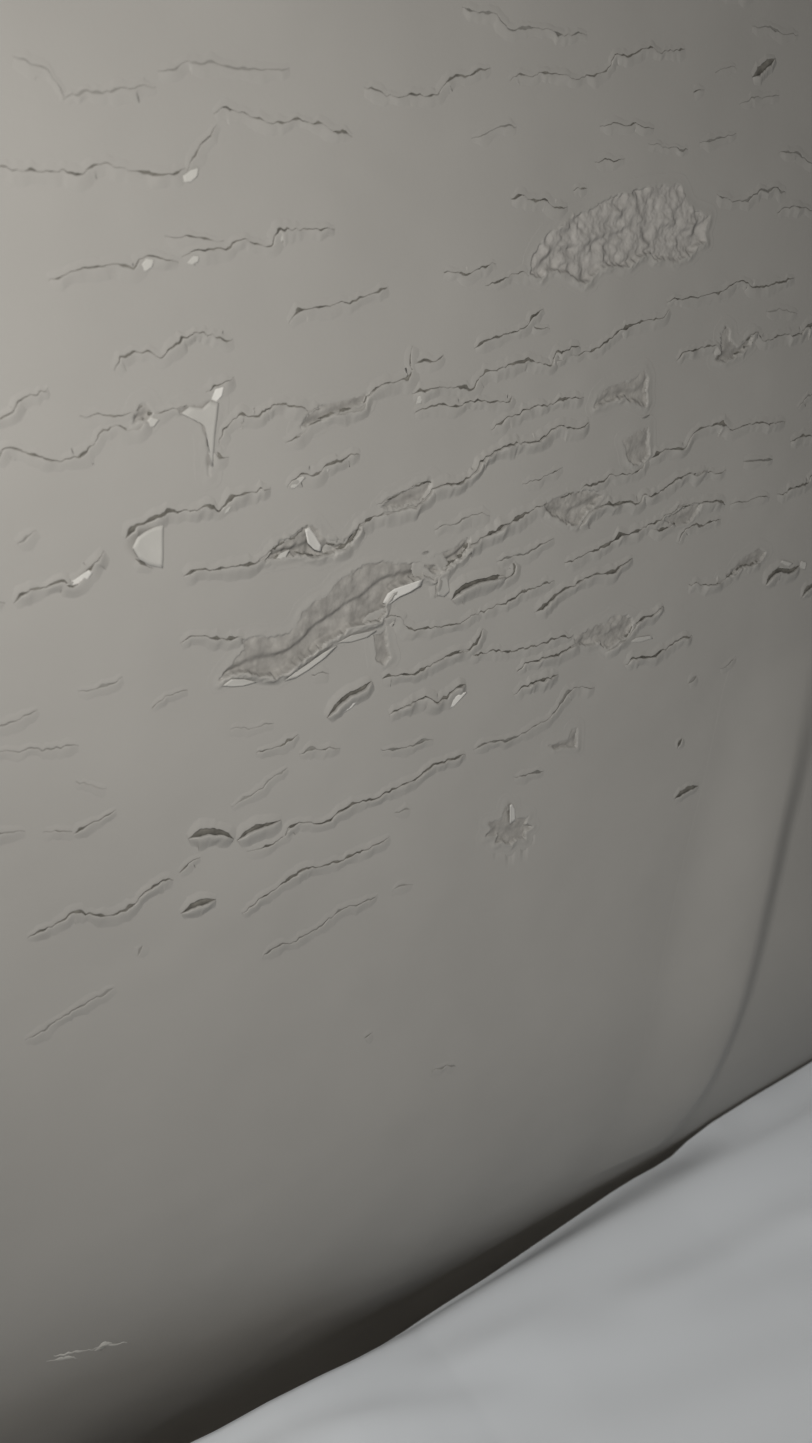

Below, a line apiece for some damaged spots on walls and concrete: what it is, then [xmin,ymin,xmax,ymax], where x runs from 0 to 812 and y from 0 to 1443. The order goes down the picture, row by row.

crack [0,62,491,193]
crack [511,182,587,221]
crack [46,217,335,292]
crack [443,258,497,287]
peeling [537,479,612,538]
peeling [207,510,448,694]
crack [0,273,812,961]
crack [25,984,117,1045]